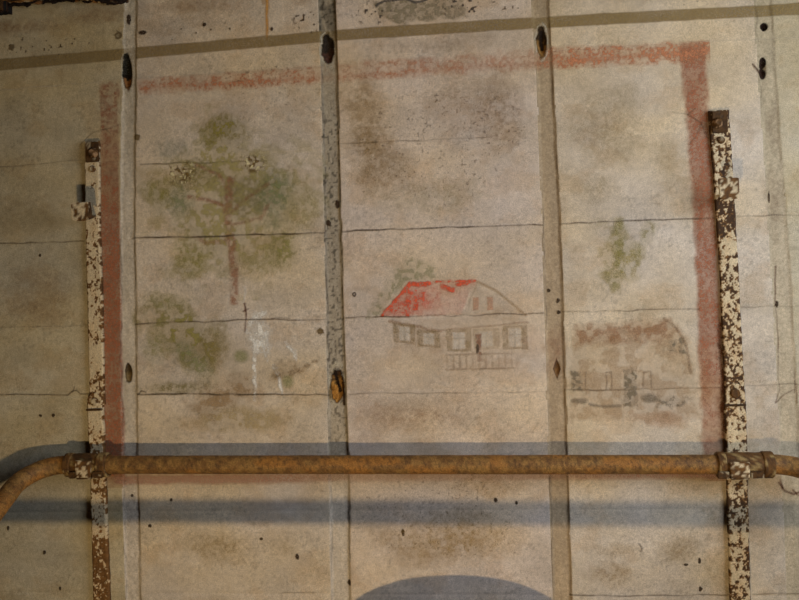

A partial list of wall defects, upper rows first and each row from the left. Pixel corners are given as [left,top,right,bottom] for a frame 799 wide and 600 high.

rust [331,361,345,405]